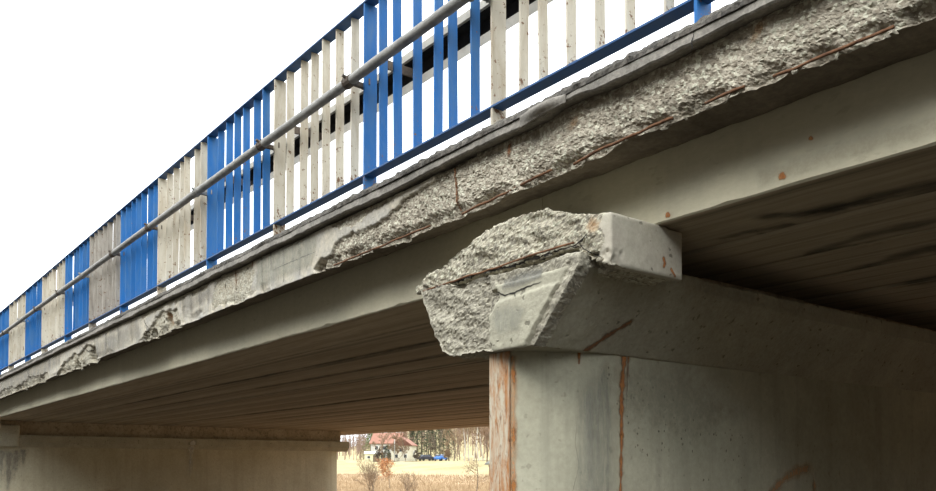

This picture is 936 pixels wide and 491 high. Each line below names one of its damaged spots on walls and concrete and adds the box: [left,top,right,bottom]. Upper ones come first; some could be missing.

spalling [316,0,936,273]
spalling [0,344,100,398]
spalling [141,263,255,341]
spalling [415,208,675,360]
rust [577,319,633,364]
rust [619,356,629,491]